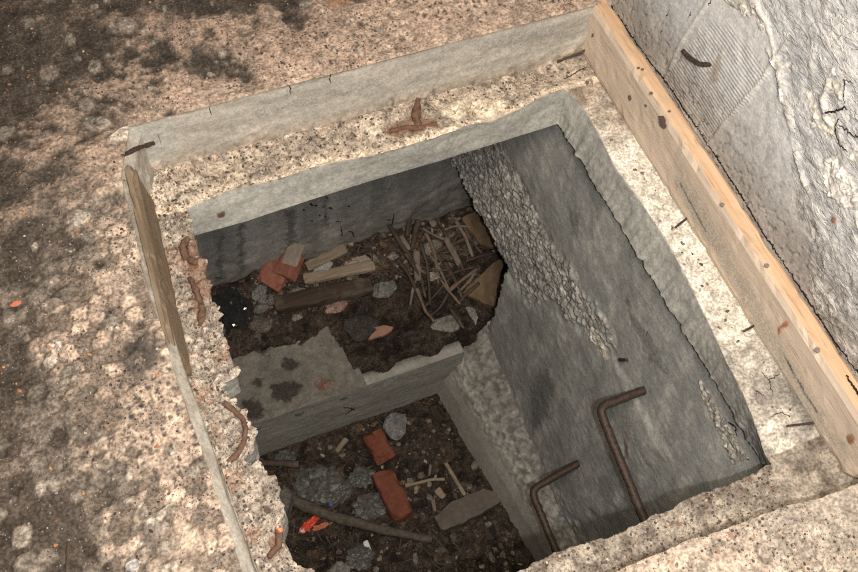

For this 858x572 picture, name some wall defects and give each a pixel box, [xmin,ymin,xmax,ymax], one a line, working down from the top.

spalling [267,527,283,559]
spalling [179,124,765,546]
crack [611,5,858,373]
crack [756,372,790,418]